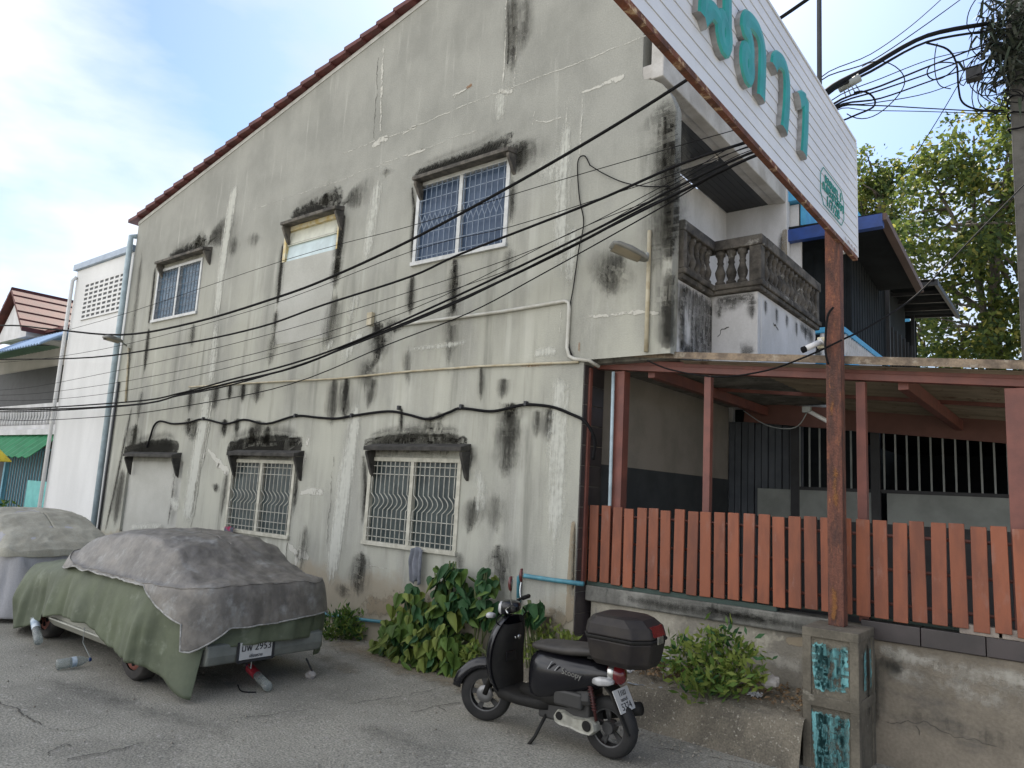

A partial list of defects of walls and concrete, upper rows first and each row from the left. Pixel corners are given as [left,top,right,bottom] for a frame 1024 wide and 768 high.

crack [261,0,644,207]
leakage [170,188,236,314]
leakage [291,186,380,282]
leakage [411,133,528,261]
leakage [544,129,576,279]
leakage [655,109,788,361]
leakage [184,327,260,517]
leakage [328,378,472,579]
leakage [502,403,515,470]
leakage [536,382,568,538]
peeling [786,637,849,693]
peeling [812,711,850,768]